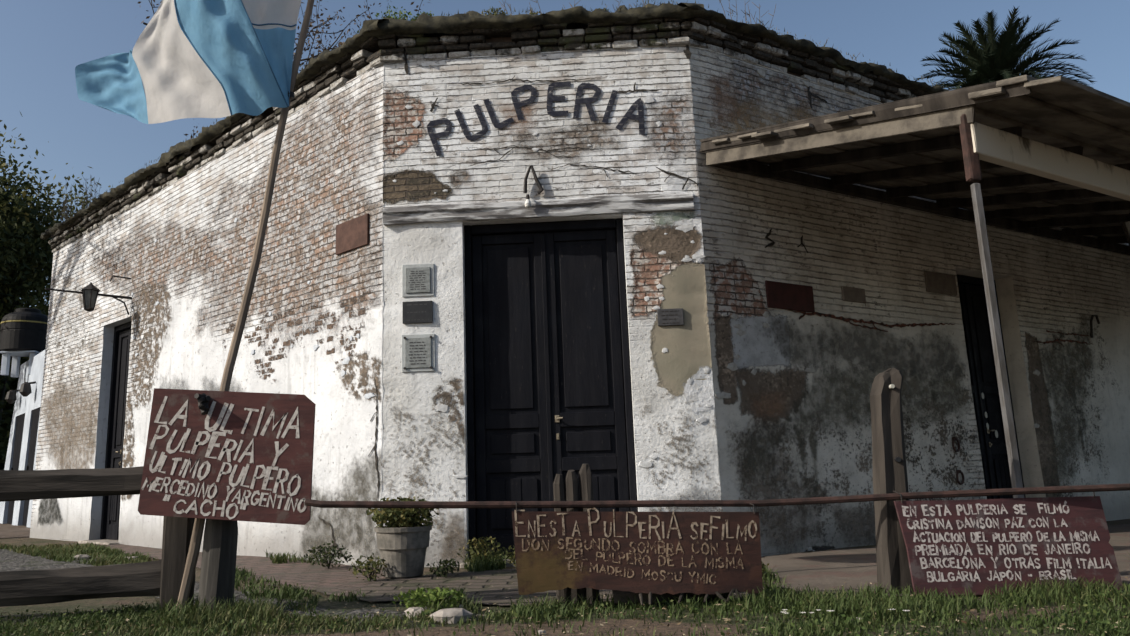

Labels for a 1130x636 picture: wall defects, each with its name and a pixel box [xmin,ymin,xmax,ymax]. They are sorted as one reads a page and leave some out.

flaking render [713,60,878,124]
flaking render [93,72,469,407]
damp [38,499,62,524]
damp [43,379,98,469]
spalling [45,273,99,391]
spalling [381,378,467,548]
peeling [629,217,954,512]
damp [735,320,975,546]
damp [1042,324,1116,497]